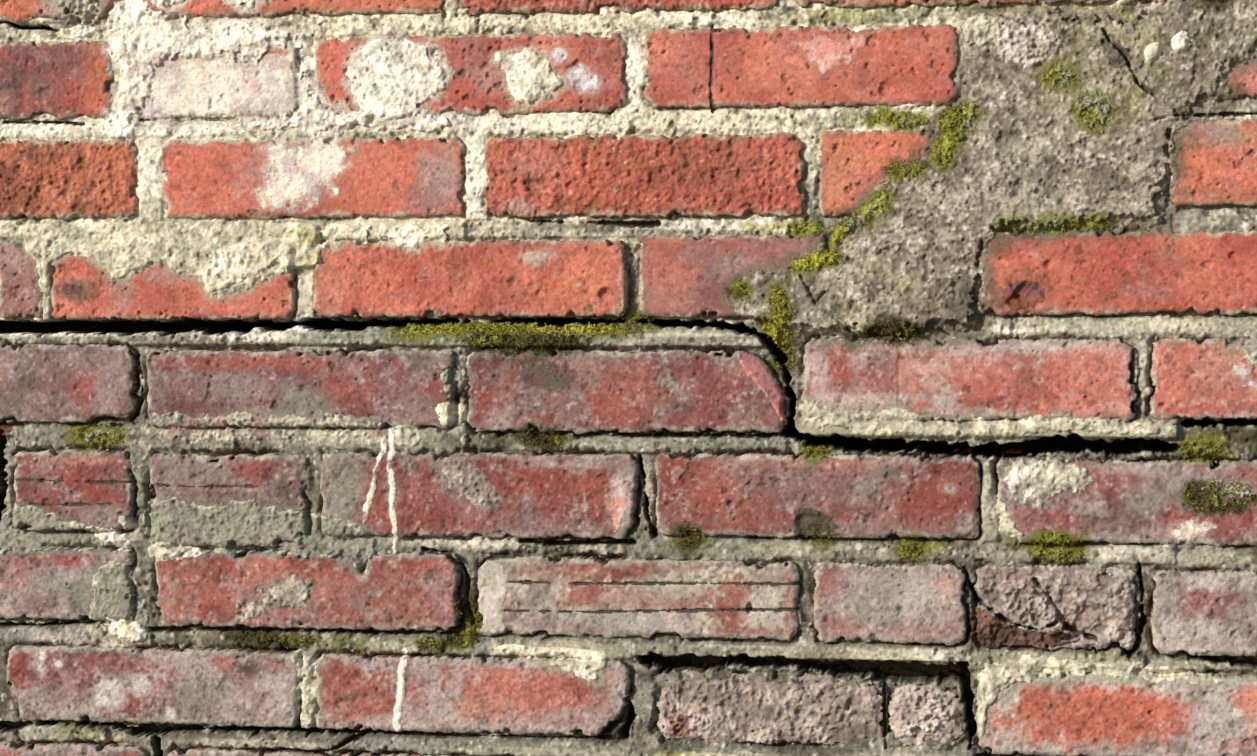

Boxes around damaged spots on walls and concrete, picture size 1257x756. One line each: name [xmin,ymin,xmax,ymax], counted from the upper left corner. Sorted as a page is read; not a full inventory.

crack [708,24,716,113]
water stain [256,130,355,216]
crack [0,316,460,423]
crack [0,440,285,514]
crack [147,317,1257,636]
water stain [1171,520,1216,544]
crack [0,620,97,628]
crack [638,651,1040,756]
crack [962,563,1147,659]
crack [1192,655,1257,668]